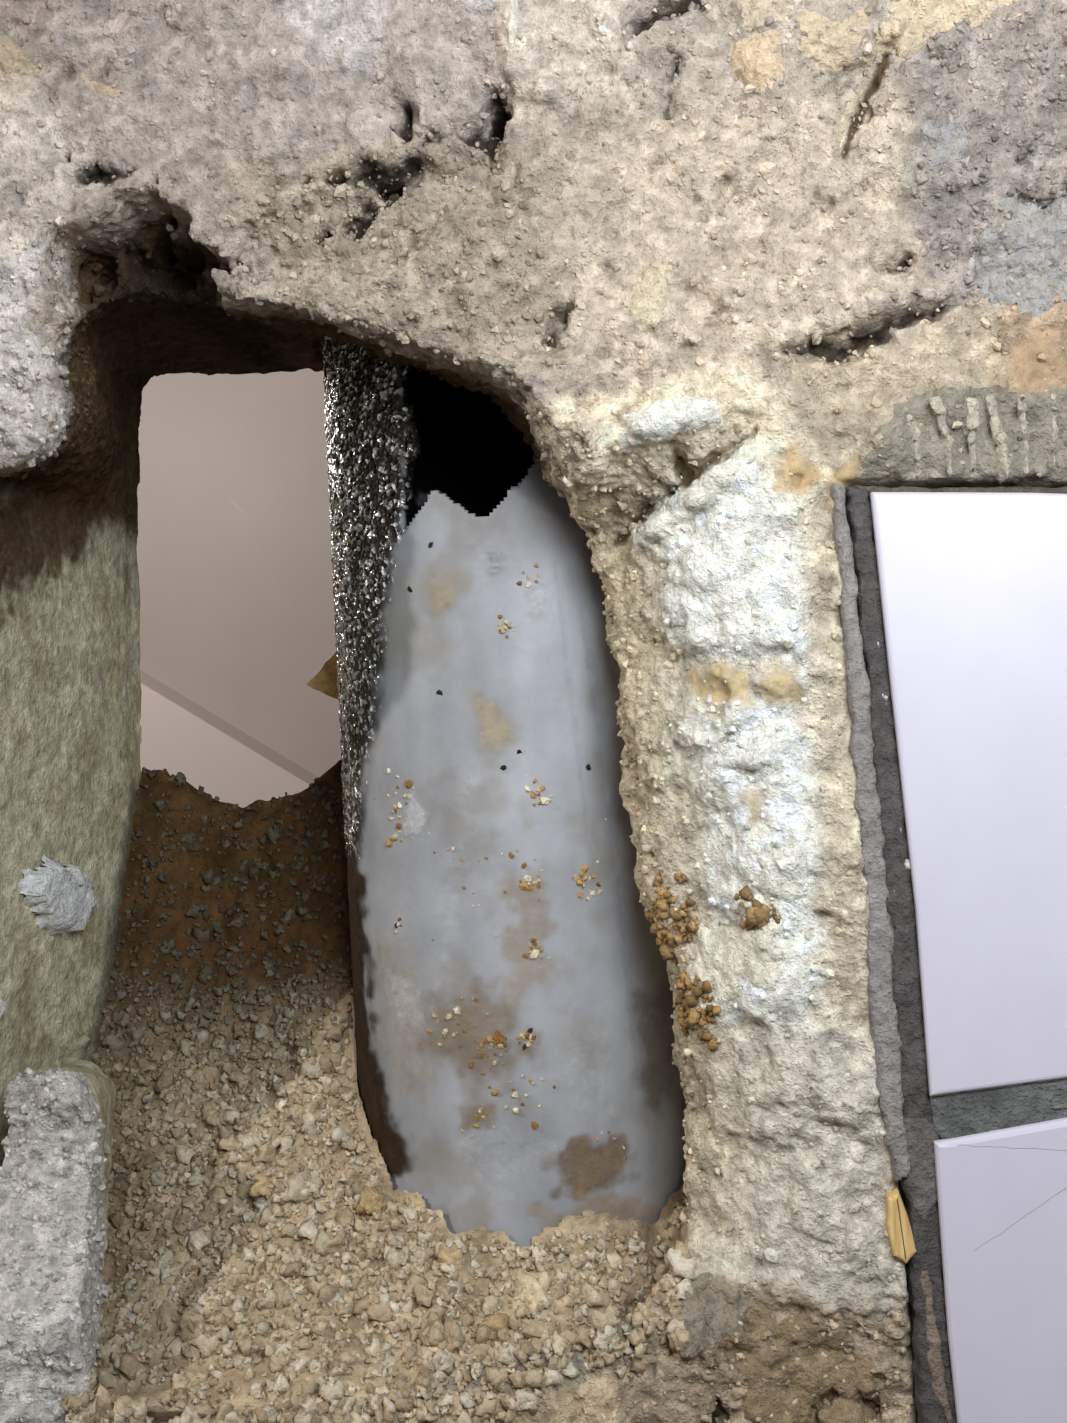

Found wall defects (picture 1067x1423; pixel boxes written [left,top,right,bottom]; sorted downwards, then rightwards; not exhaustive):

crack [884,258,911,273]
crack [795,304,950,363]